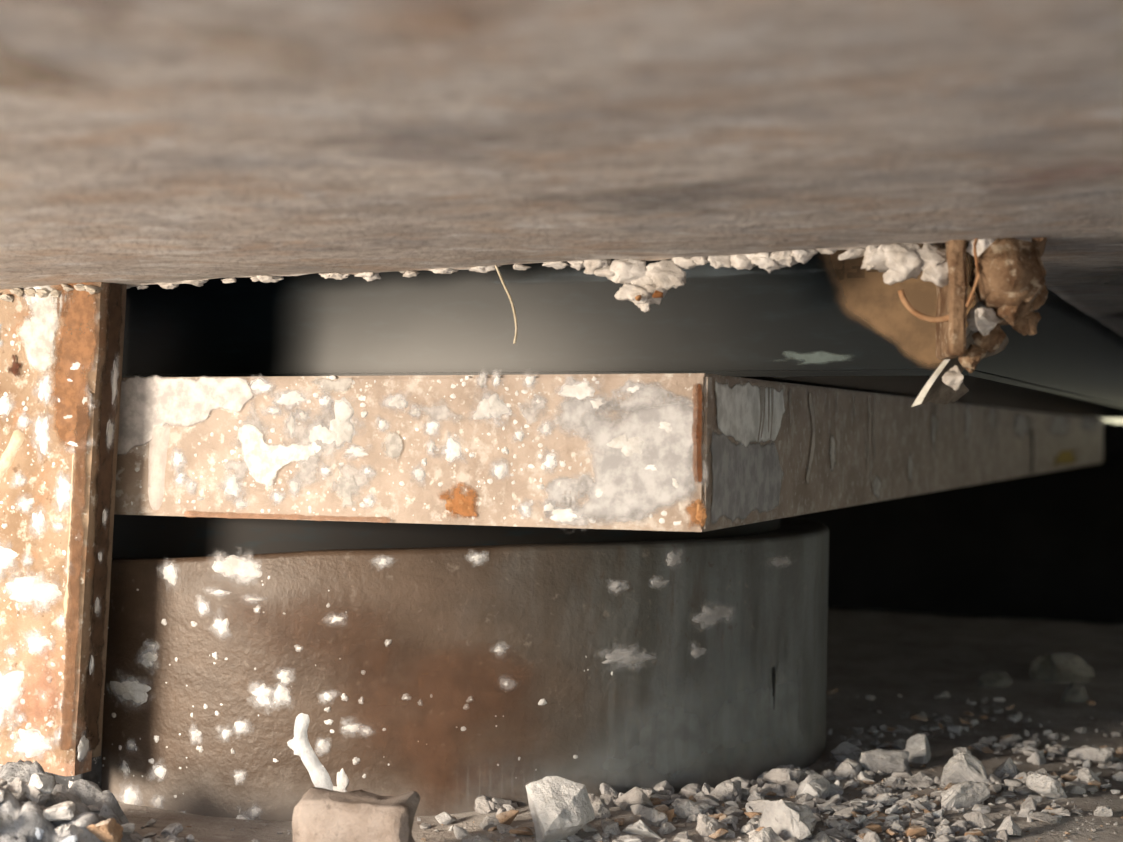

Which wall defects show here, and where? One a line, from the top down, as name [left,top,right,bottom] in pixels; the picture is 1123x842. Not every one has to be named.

water stain [521,271,610,283]
water stain [682,264,750,277]
water stain [785,352,849,364]
corrosion [30,282,123,750]
corrosion [439,483,477,517]
corrosion [685,499,707,527]
water stain [595,679,804,779]